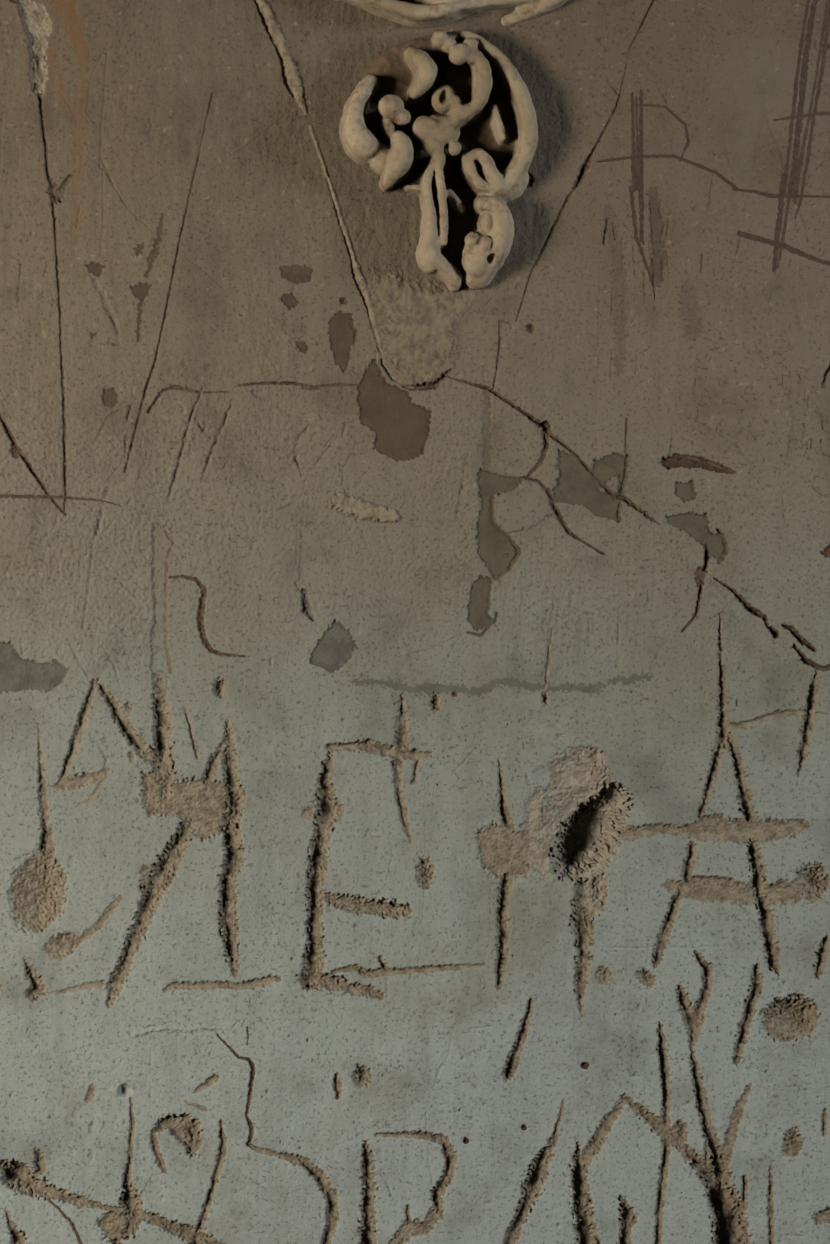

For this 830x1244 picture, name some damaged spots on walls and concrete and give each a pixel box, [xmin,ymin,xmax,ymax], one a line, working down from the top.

flaking render [327,262,484,463]
peeling [465,386,525,638]
peeling [551,418,630,524]
peeling [664,478,729,565]
peeling [0,640,69,694]
peeling [299,587,359,674]
crack [680,545,830,673]
crack [215,1026,257,1148]